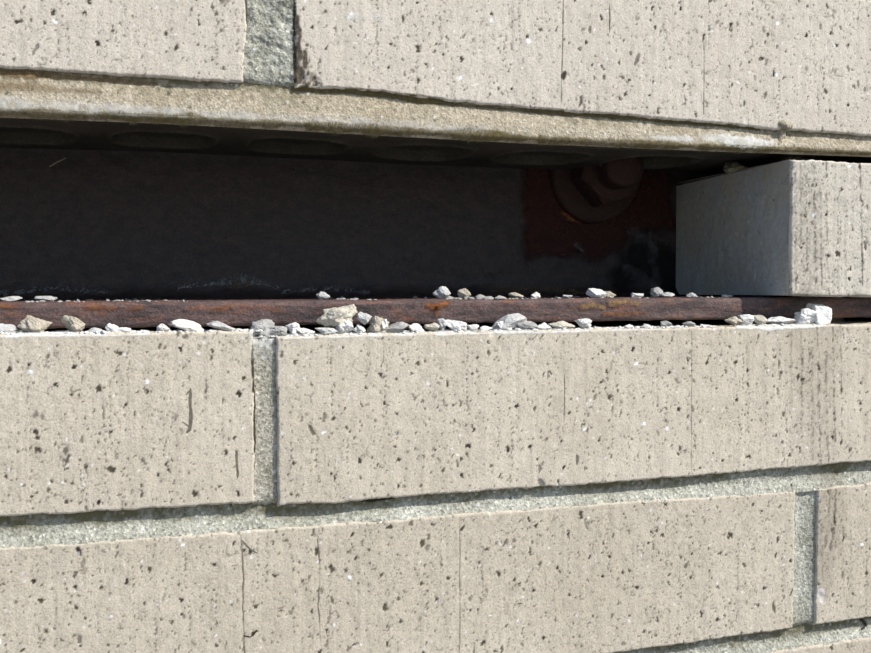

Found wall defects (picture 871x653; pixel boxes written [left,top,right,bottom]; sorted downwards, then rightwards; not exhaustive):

peeling [611,233,680,296]
rust [580,300,640,316]